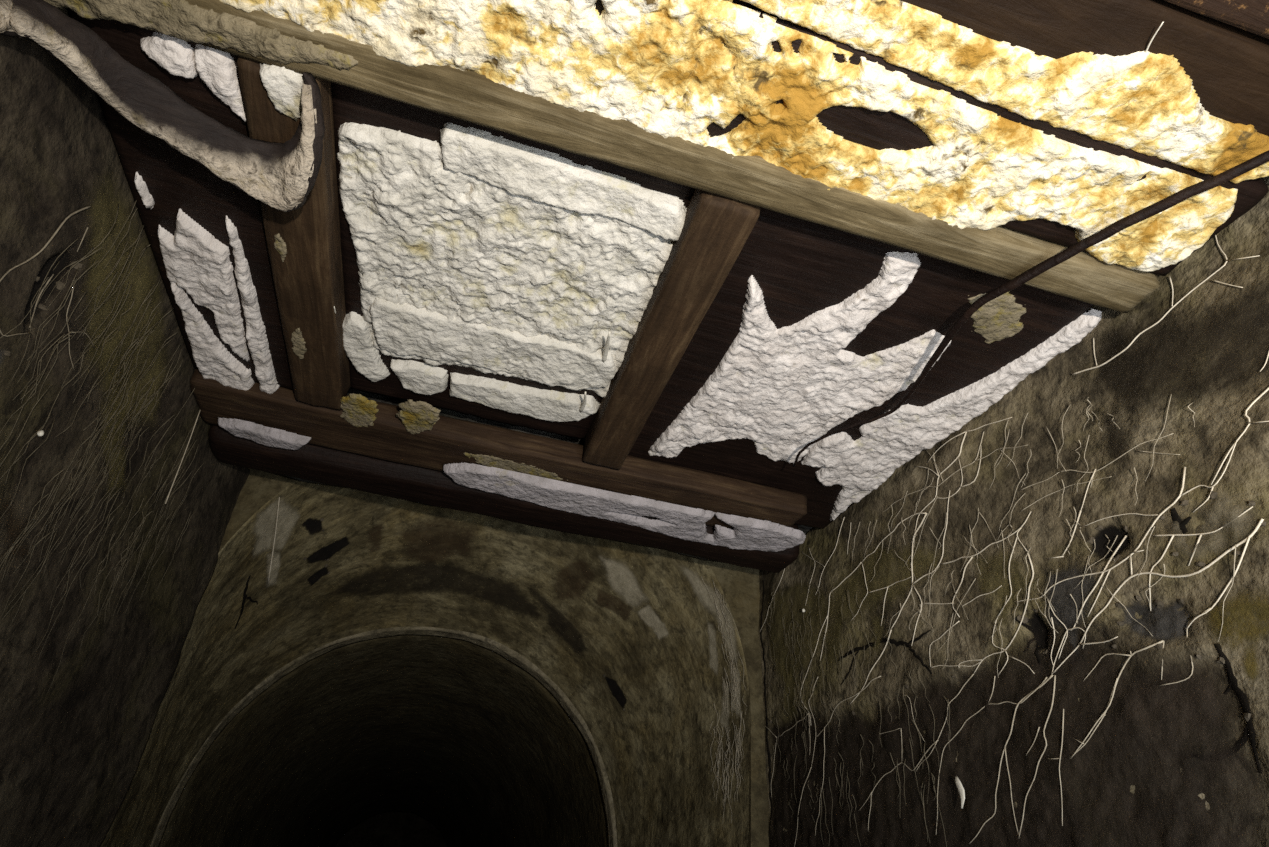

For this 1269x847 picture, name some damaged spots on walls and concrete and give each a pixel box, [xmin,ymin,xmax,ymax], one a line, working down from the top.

leakage [968,291,1026,344]
leakage [340,394,379,427]
leakage [396,399,441,434]
leakage [463,452,568,482]
crack [1170,508,1191,534]
crack [837,630,933,685]
crack [1015,617,1041,663]
crack [1214,643,1263,774]